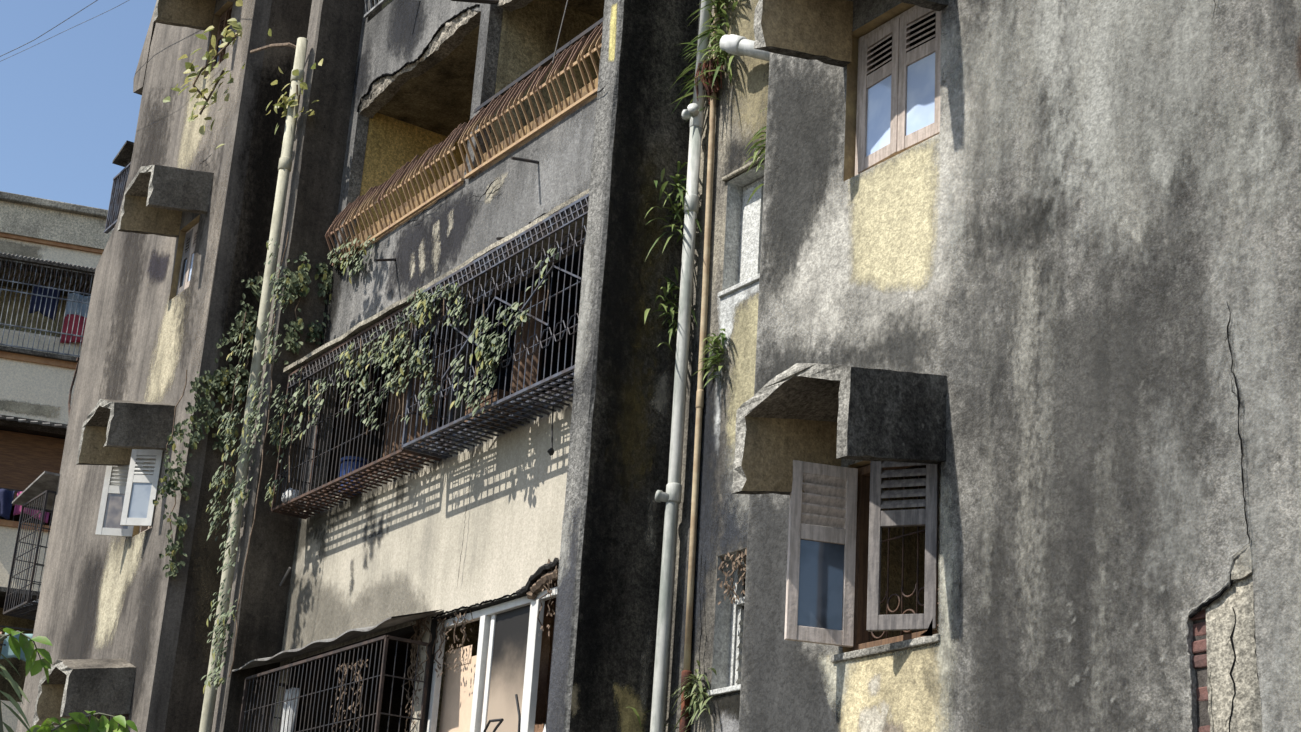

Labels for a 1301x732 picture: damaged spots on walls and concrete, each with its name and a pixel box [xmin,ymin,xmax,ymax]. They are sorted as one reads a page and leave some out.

spalling [357,0,533,118]
damp [721,0,1301,393]
damp [279,0,658,732]
damp [651,373,669,413]
damp [1014,259,1037,559]
crack [1225,303,1250,543]
spalling [1185,538,1263,732]